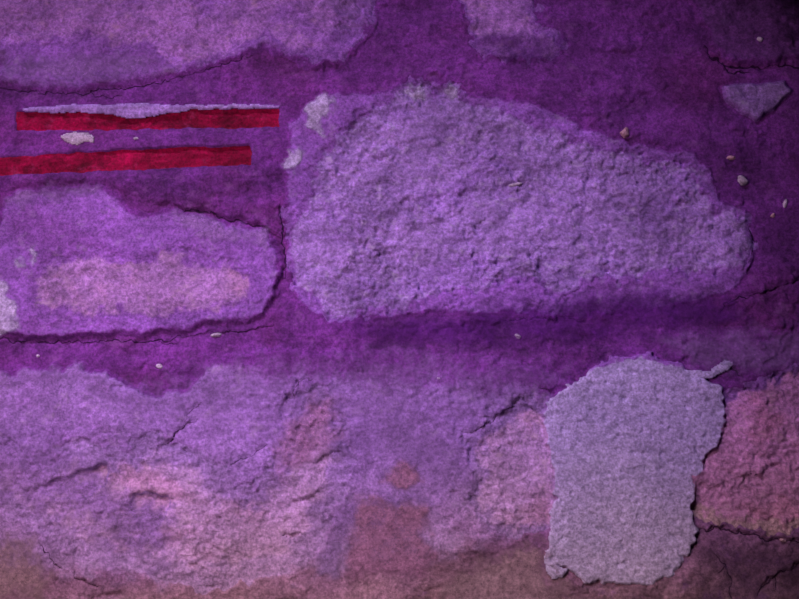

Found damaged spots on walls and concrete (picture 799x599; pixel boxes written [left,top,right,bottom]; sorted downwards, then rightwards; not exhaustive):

spalling [458,0,569,65]
crack [182,204,286,278]
peeling [683,360,733,379]
peeling [544,553,568,579]